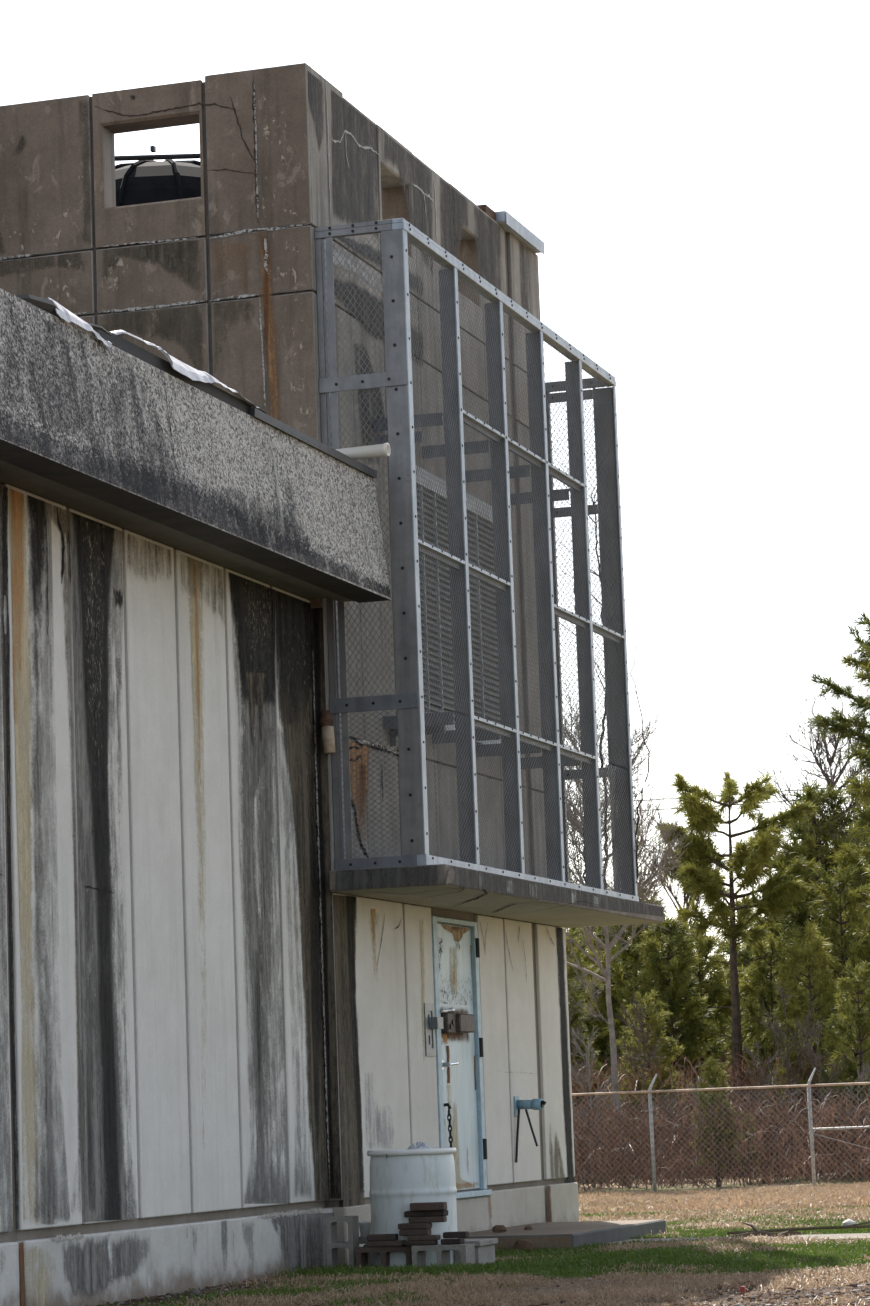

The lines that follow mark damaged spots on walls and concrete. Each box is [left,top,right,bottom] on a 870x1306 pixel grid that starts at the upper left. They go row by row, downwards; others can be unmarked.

crack [95,76,259,228]
crack [326,87,382,213]
damp [29,326,179,504]
corrosion [261,236,279,420]
damp [214,456,314,556]
corrosion [188,558,205,912]
damp [28,495,664,1296]
damp [0,785,14,1232]
corrosion [441,1033,469,1083]